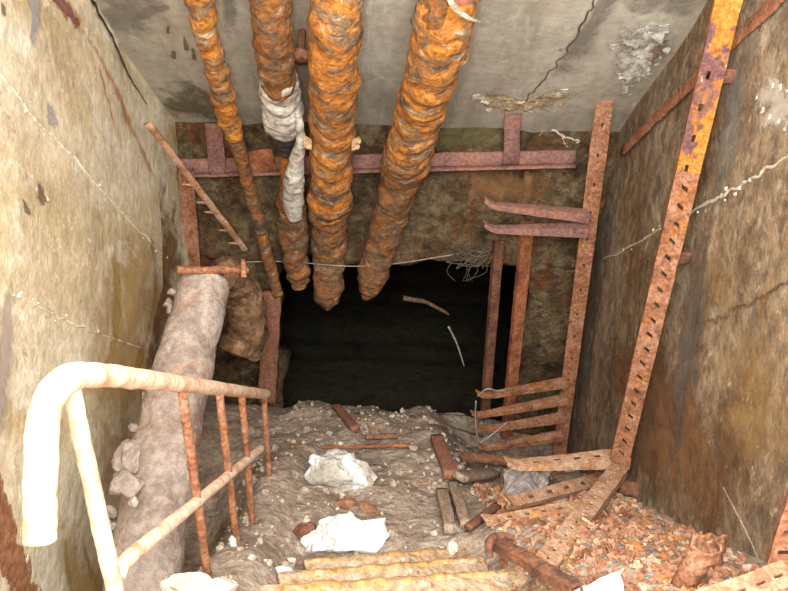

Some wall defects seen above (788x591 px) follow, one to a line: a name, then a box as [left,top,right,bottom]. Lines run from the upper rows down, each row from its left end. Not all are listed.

rust [54,0,80,29]
crack [91,0,147,104]
crack [525,0,594,101]
spalling [609,22,672,96]
rust [108,88,138,140]
spalling [471,89,578,115]
crack [705,281,788,325]